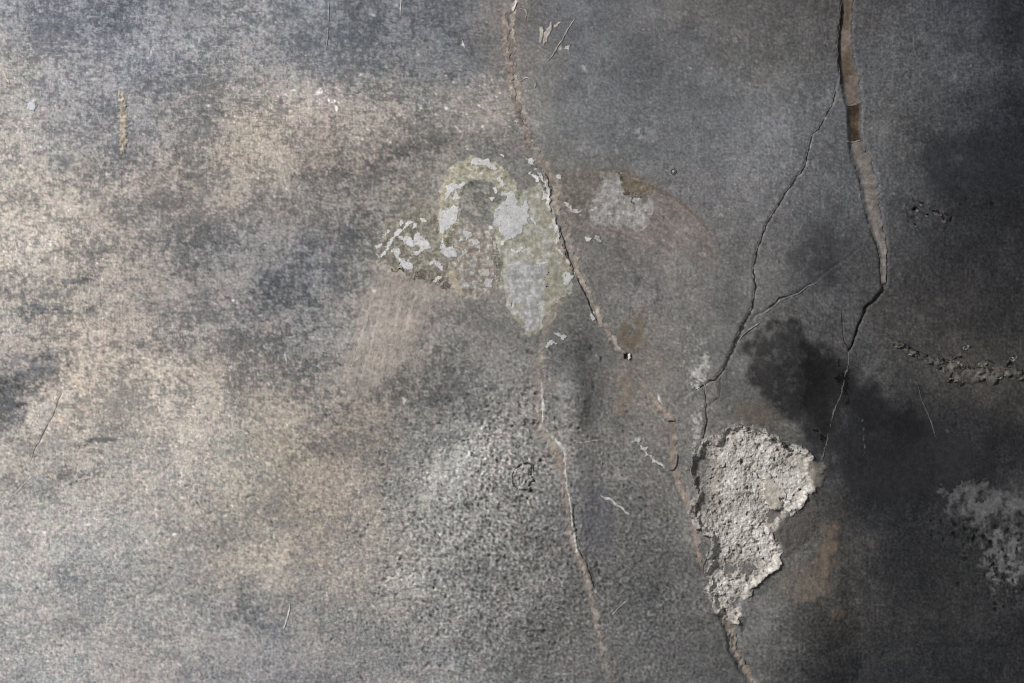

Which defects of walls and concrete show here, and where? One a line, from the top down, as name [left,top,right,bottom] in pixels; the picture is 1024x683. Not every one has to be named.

peeling [374,182,481,283]
peeling [478,268,494,288]
peeling [471,153,537,254]
peeling [525,158,561,200]
peeling [561,271,576,286]
crack [630,0,888,576]
peeling [545,332,571,349]
crack [499,0,625,683]
water stain [735,315,1024,527]
spalling [686,422,829,683]